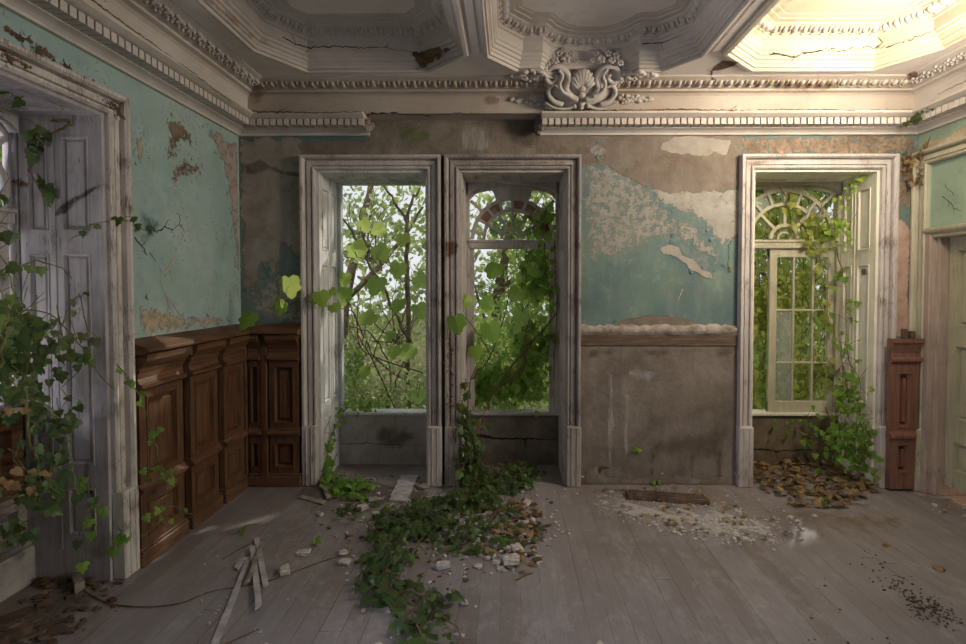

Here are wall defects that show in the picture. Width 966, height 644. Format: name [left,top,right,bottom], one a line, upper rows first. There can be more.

peeling [0,25,95,81]
crack [92,0,231,102]
crack [283,34,411,56]
spalling [412,46,450,70]
crack [769,29,938,62]
peeling [97,93,126,121]
peeling [167,112,205,189]
spalling [202,114,966,337]
crack [135,217,185,315]
peeling [135,294,228,335]
crack [476,434,555,448]